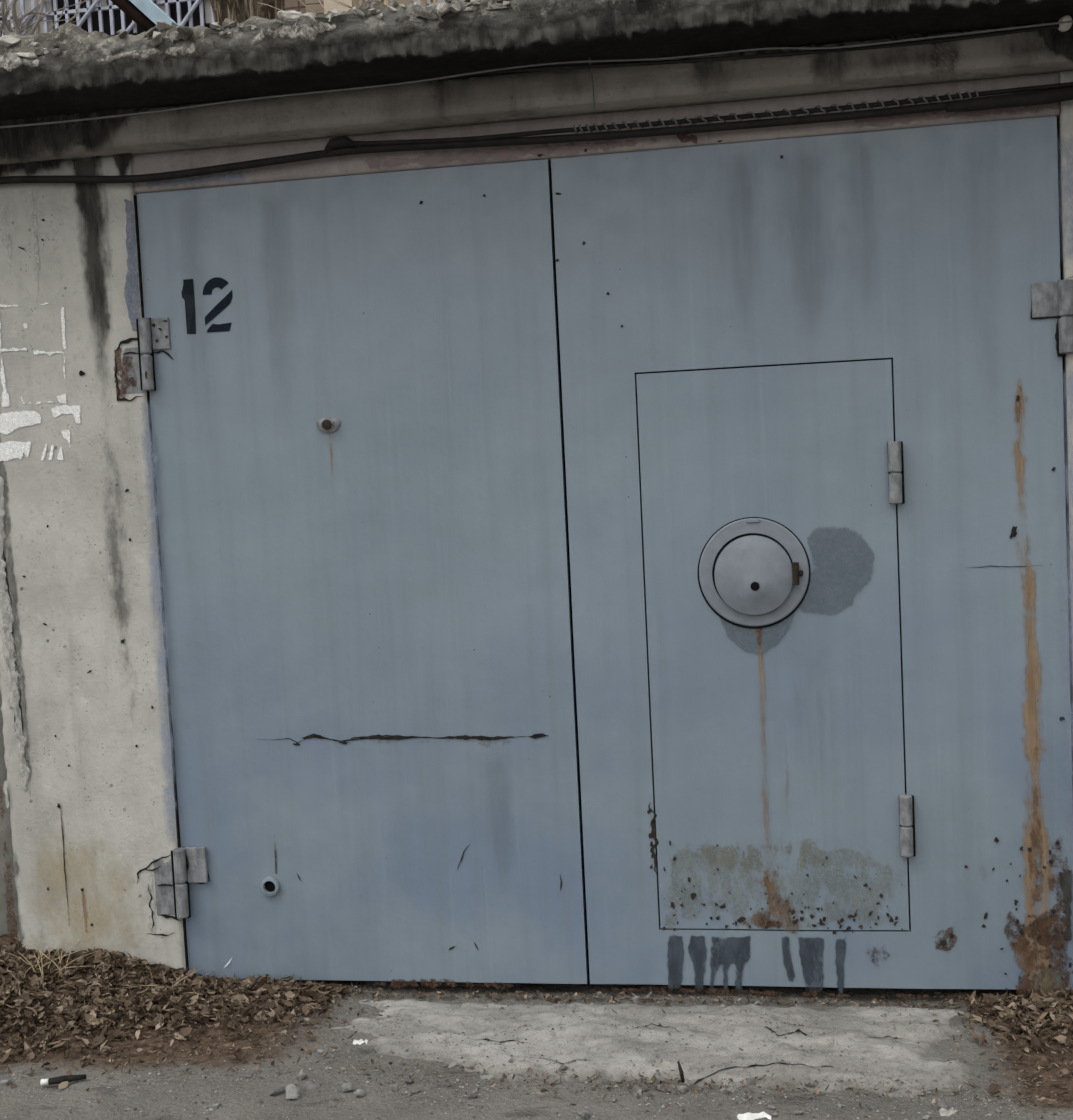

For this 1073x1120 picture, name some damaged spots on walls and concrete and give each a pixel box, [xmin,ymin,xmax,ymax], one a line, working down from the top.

damp [0,0,999,95]
damp [1037,21,1073,61]
damp [0,107,148,356]
rust [1014,381,1024,495]
damp [111,520,127,619]
crack [275,733,549,746]
rust [1000,565,1073,997]
peeling [663,873,903,934]